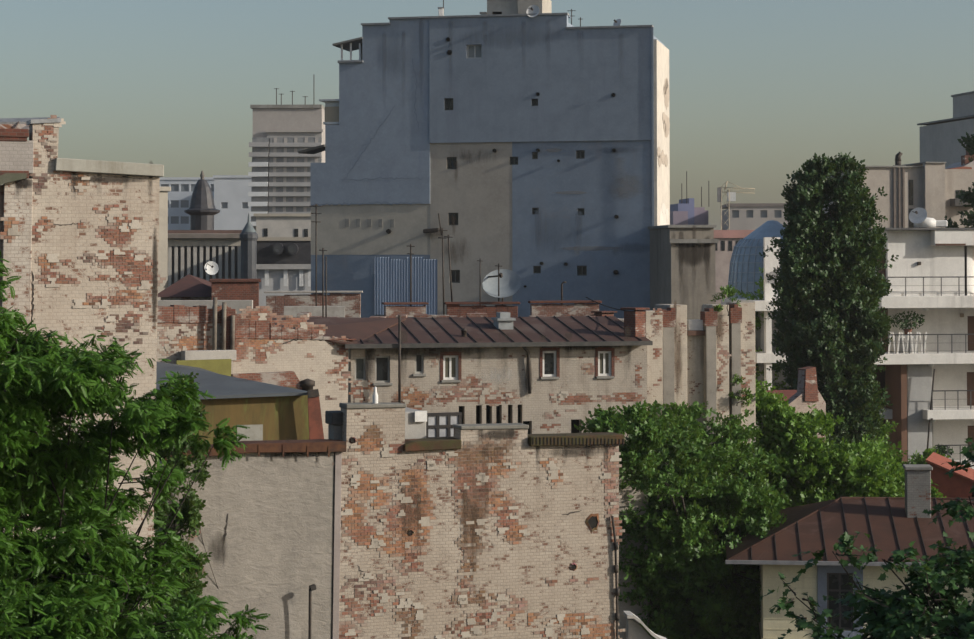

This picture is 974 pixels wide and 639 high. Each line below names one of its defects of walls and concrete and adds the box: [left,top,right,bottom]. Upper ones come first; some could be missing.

spalling [0,204,222,356]
spalling [233,306,375,403]
spalling [391,374,520,410]
spalling [540,365,662,431]
spalling [717,324,756,397]
spalling [332,422,625,639]